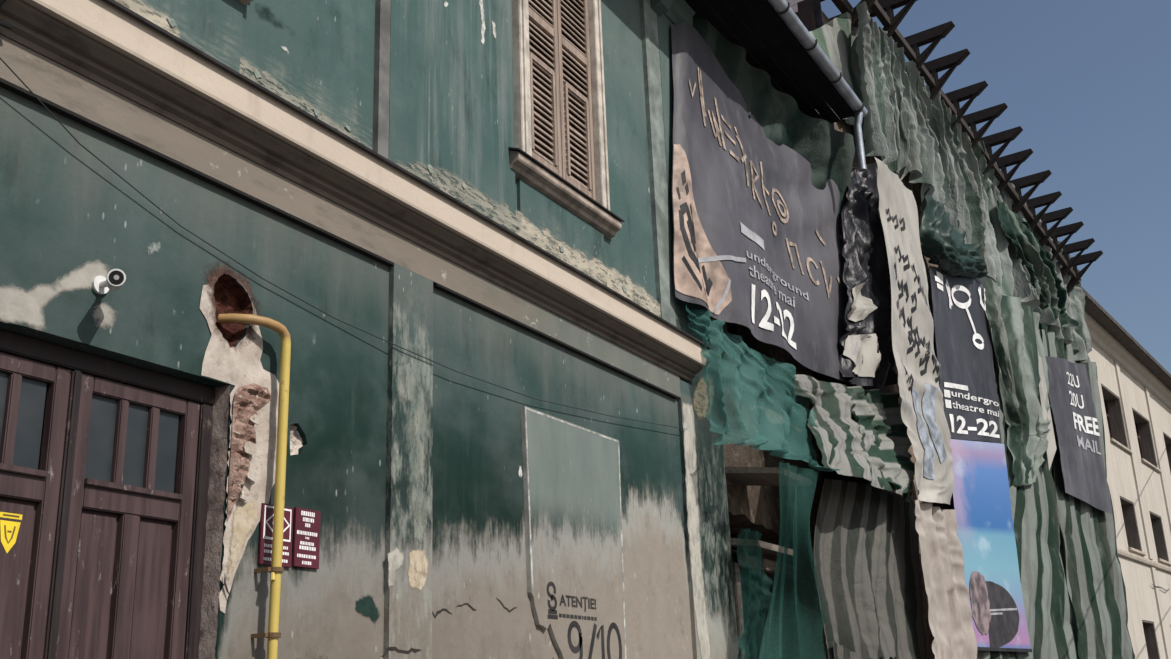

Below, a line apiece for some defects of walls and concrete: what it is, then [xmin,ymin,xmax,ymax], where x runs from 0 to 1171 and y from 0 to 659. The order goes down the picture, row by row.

peeling [115,0,179,38]
peeling [239,58,372,150]
rust [208,265,258,349]
peeling [397,162,661,316]
flaking render [198,273,303,659]
peeling [388,363,428,591]
peeling [682,378,710,659]